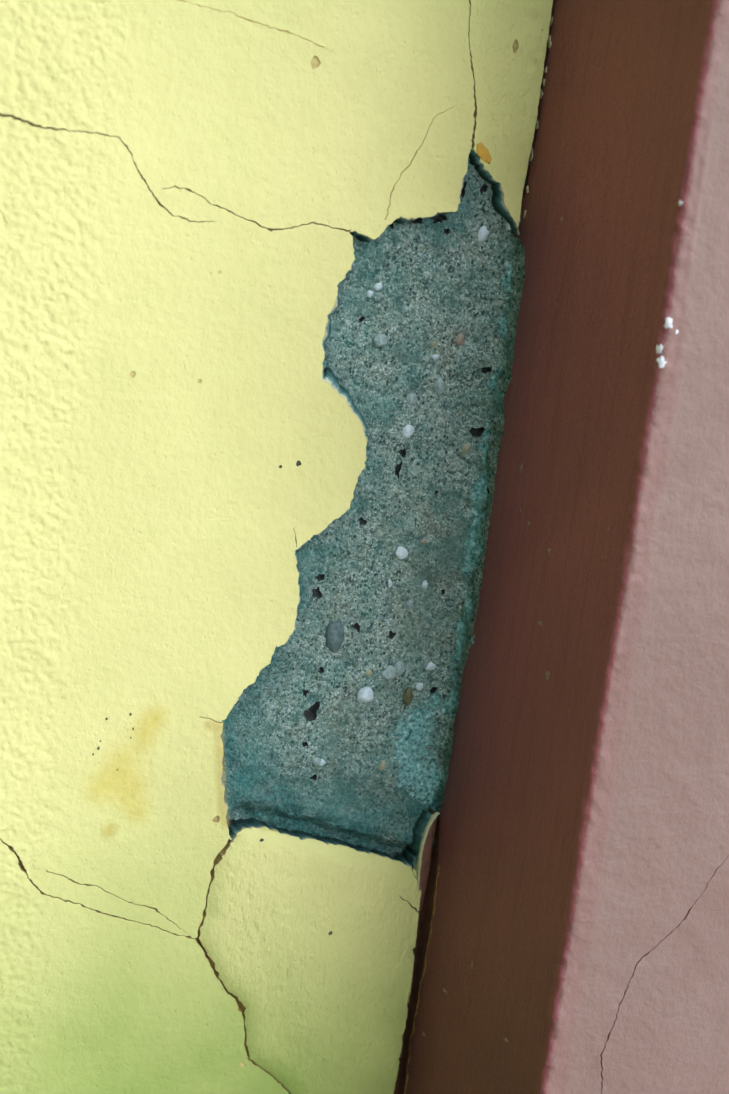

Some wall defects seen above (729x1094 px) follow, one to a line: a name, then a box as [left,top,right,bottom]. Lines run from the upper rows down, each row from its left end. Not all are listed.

crack [0,113,350,232]
crack [179,0,337,55]
crack [385,0,477,220]
flaking render [213,142,526,1094]
crack [0,838,291,1094]
crack [600,857,728,1094]